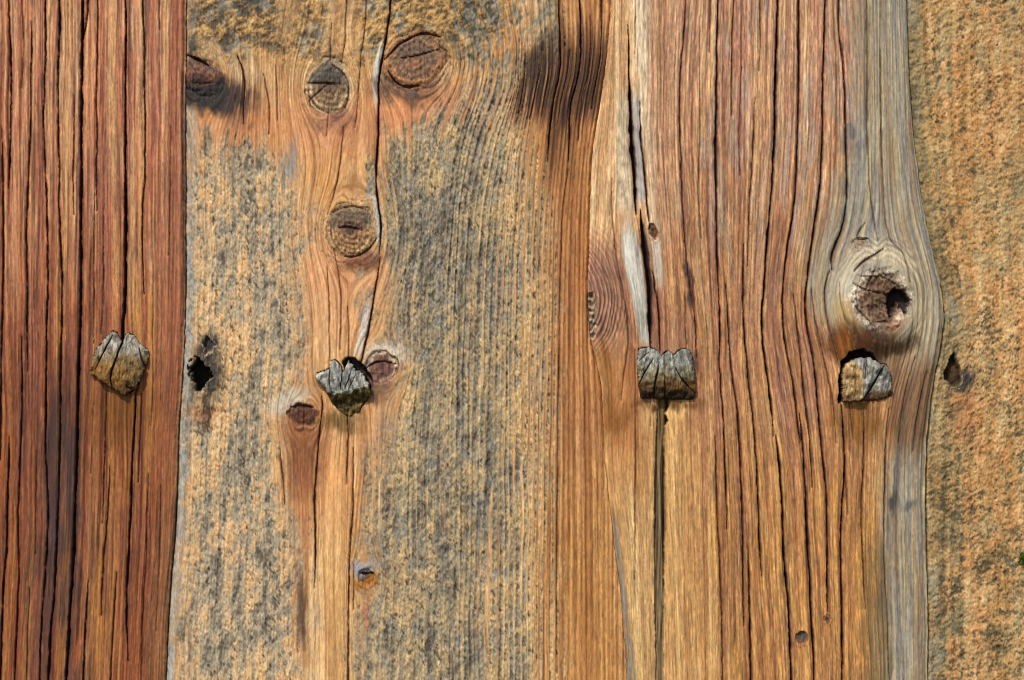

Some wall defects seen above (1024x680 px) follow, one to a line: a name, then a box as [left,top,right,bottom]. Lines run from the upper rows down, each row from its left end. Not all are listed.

crack [291,0,441,680]
crack [516,0,927,680]